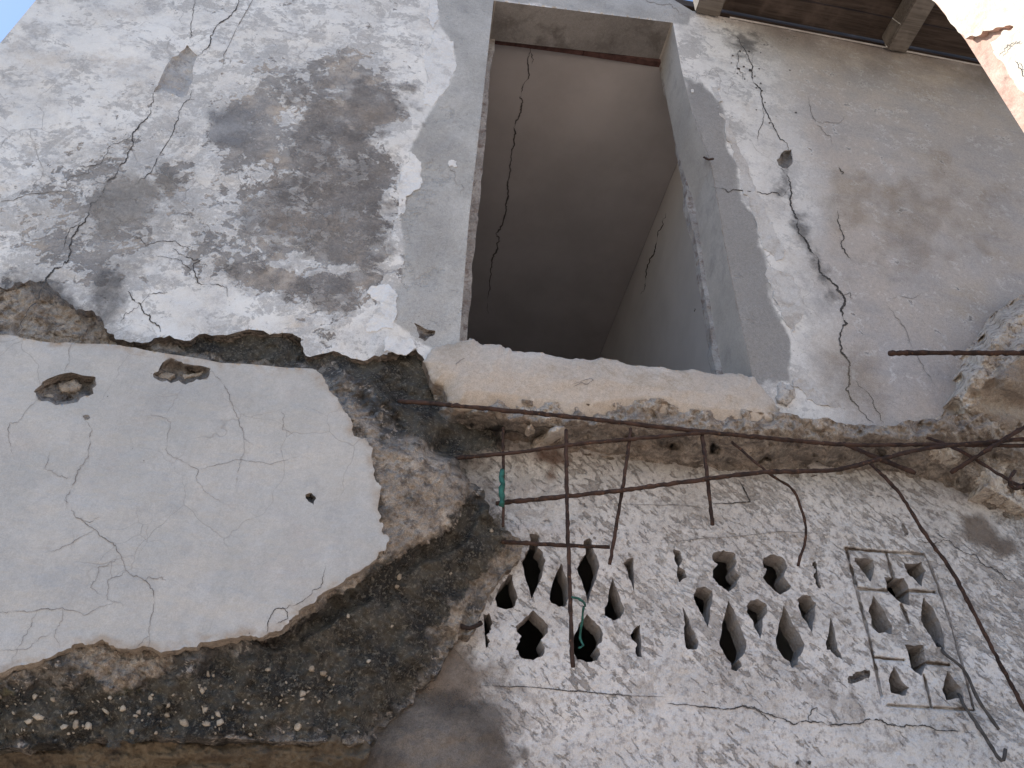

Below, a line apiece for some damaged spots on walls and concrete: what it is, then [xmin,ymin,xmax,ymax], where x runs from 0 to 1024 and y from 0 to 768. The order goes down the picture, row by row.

crack [190,0,239,56]
leakage [209,109,256,147]
crack [0,90,192,333]
peeling [397,151,423,218]
crack [714,37,881,420]
peeling [365,284,435,356]
spalling [35,377,96,405]
spalling [153,358,210,384]
rust [538,450,565,478]
crack [0,424,165,658]
spalling [397,399,1024,712]
crack [484,685,971,733]